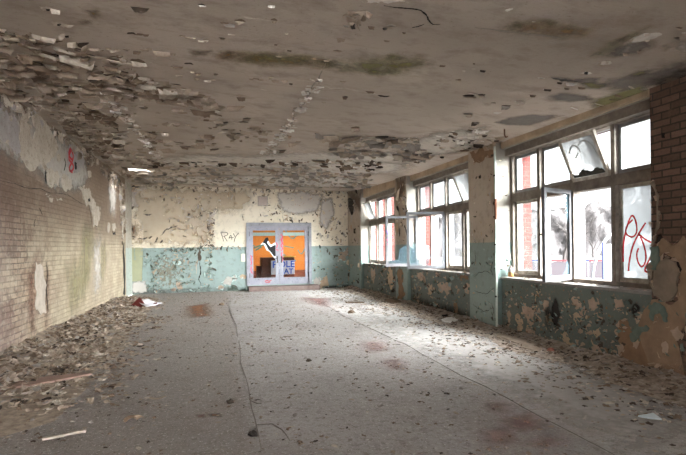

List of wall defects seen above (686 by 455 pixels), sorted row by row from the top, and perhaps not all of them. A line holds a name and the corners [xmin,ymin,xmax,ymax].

peeling [0,7,511,329]
peeling [463,93,536,114]